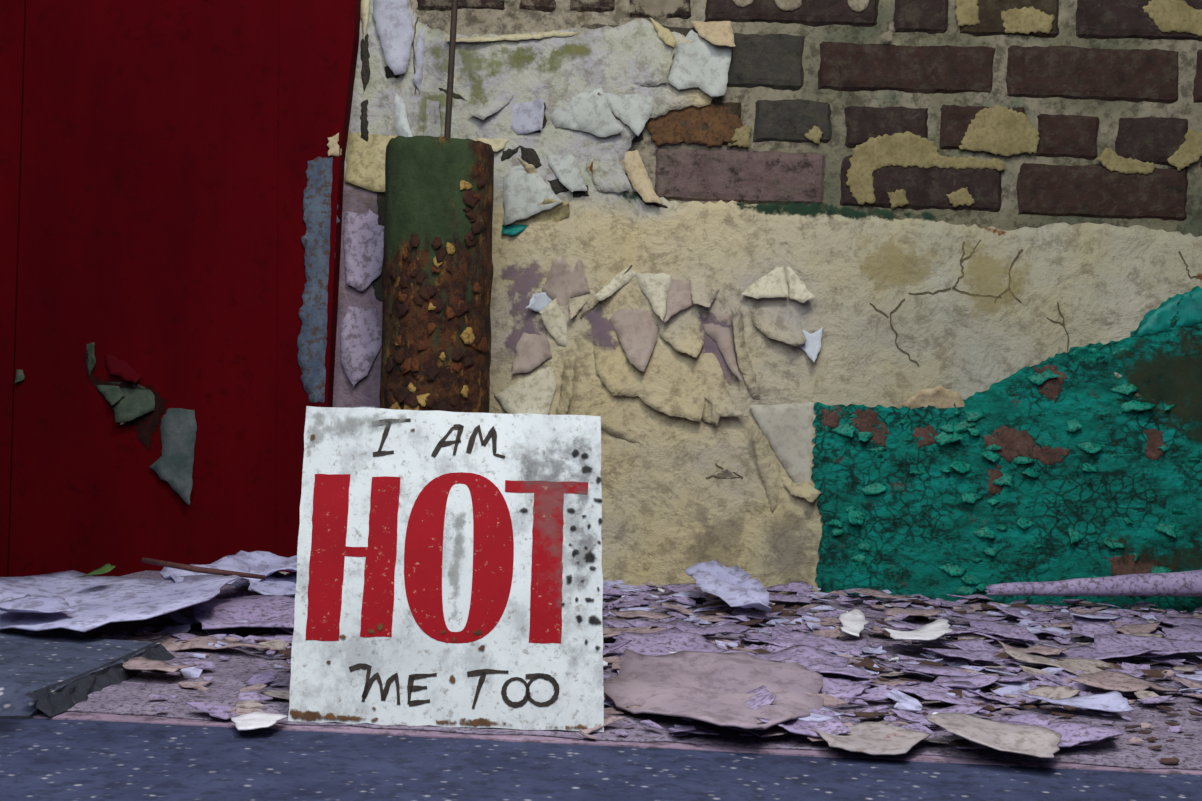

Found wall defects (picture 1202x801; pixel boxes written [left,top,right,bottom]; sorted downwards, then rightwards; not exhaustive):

peeling [775,0,802,11]
peeling [955,0,980,27]
peeling [1001,6,1055,34]
peeling [1142,0,1202,37]
peeling [846,105,1040,209]
peeling [1096,128,1202,175]
peeling [297,0,752,407]
crack [1179,251,1202,278]
crack [869,239,1069,367]
rust [390,382,430,410]
peeling [84,342,197,505]
peeling [495,256,1202,758]